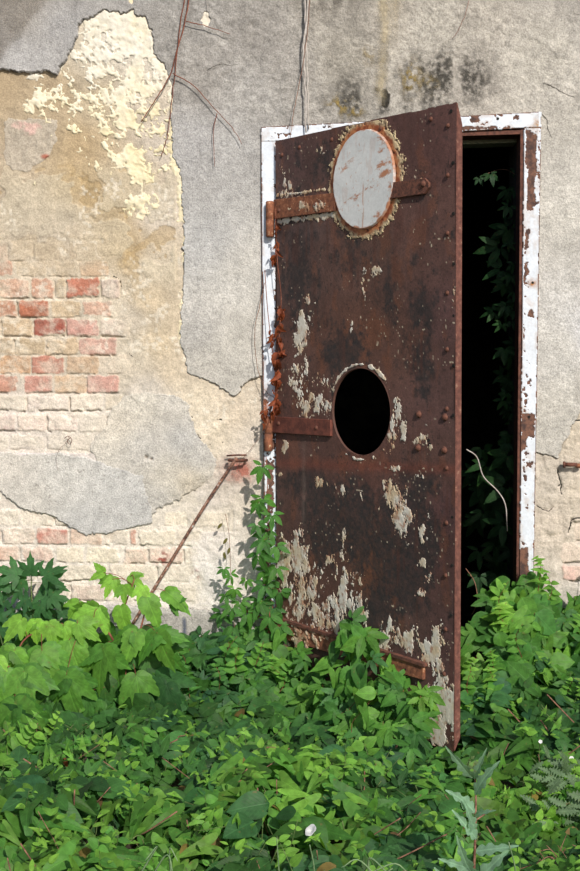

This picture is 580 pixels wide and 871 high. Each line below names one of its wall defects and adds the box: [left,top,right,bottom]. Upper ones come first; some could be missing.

flaking render [0,0,406,650]
peeling [393,397,427,445]
flaking render [461,112,580,609]
peeling [382,478,426,544]
peeling [379,615,454,747]